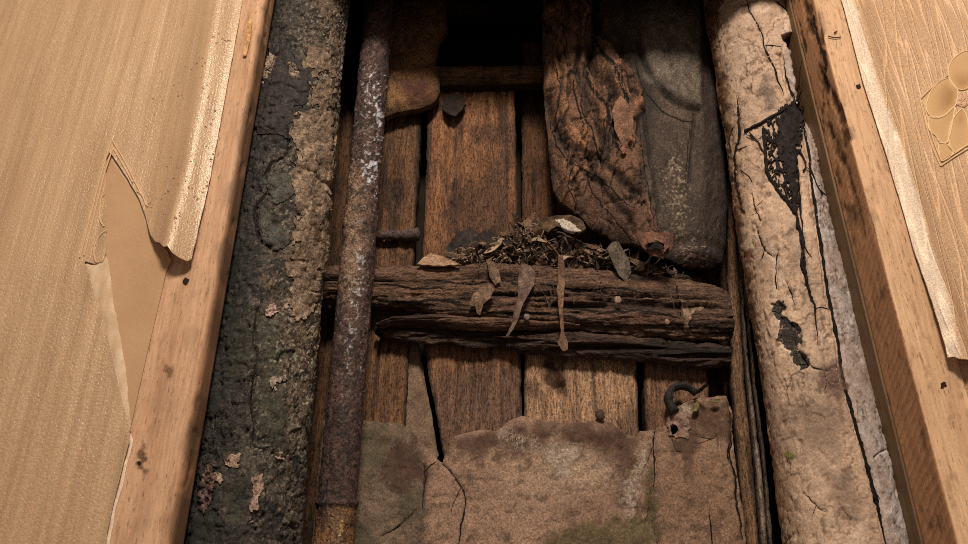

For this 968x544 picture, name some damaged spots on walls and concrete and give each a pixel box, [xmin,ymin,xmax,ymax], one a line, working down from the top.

crack [747,2,795,99]
crack [810,15,829,89]
crack [728,99,886,544]
peeling [269,374,288,391]
peeling [198,452,241,514]
peeling [249,473,264,526]
rust [326,506,348,544]
crack [382,462,466,542]